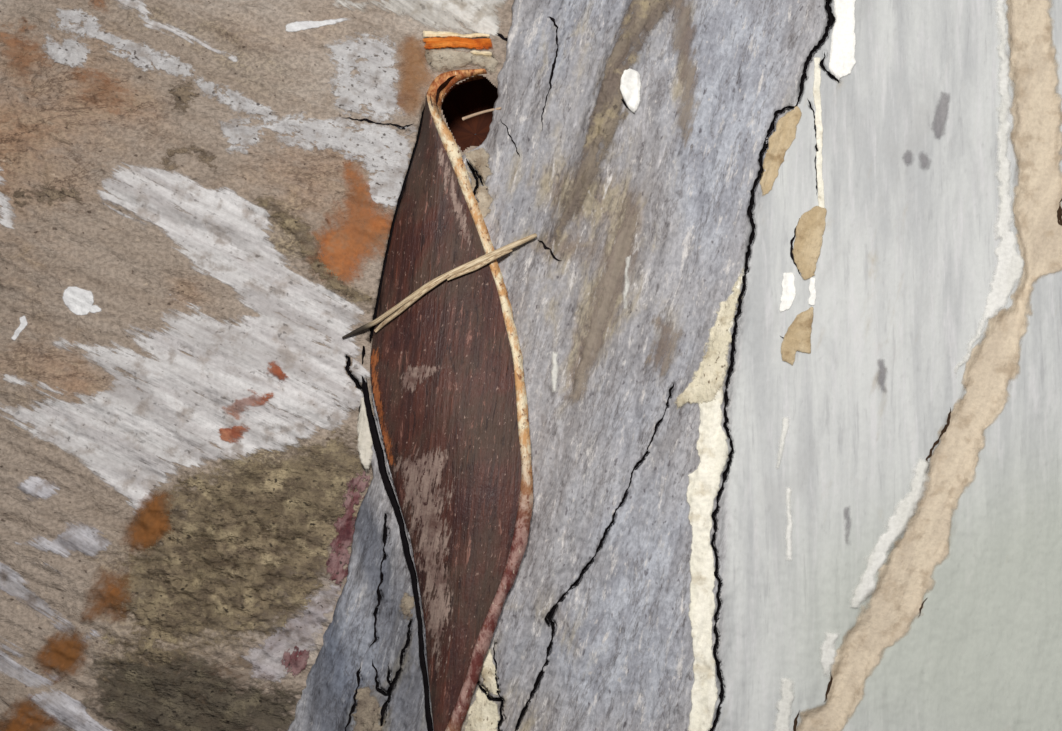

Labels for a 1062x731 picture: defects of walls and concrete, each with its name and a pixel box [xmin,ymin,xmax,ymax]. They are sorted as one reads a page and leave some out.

rust [399,31,492,109]
spalling [760,106,802,195]
rust [315,163,392,281]
rust [219,392,273,443]
rust [268,362,288,380]
crack [345,106,433,731]
crack [710,0,839,731]
spalling [775,0,1062,731]
crack [925,407,951,473]
rust [128,494,169,549]
crack [477,384,674,731]
peeling [675,271,744,731]